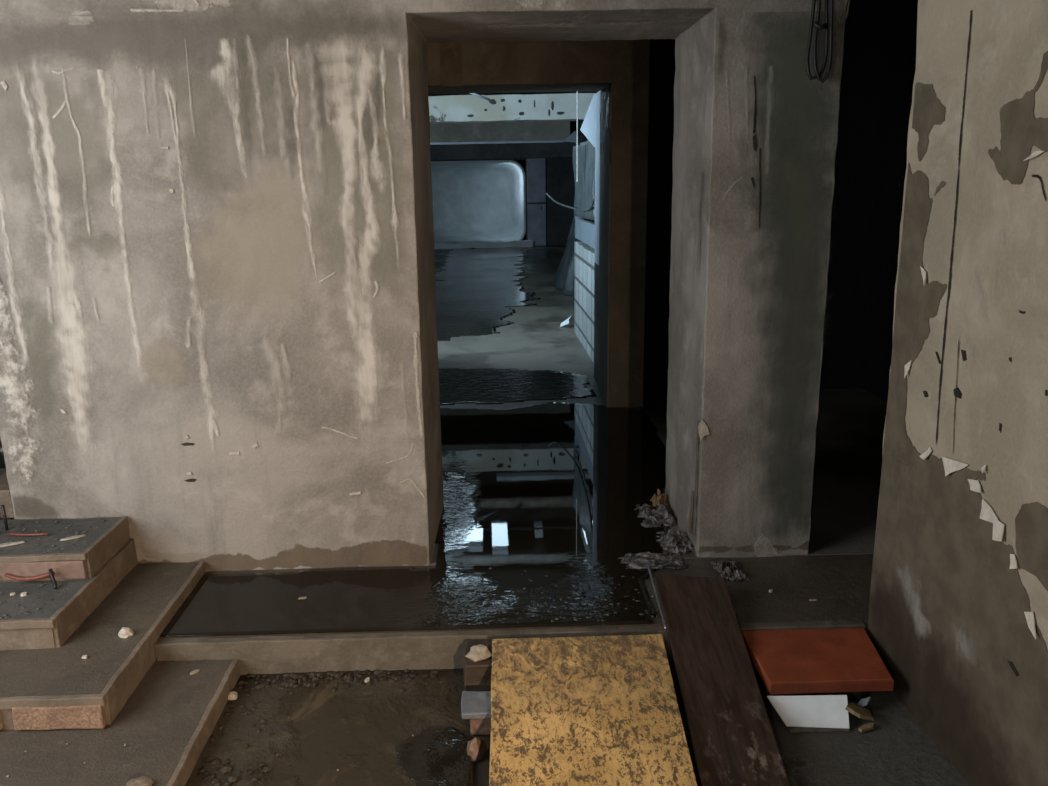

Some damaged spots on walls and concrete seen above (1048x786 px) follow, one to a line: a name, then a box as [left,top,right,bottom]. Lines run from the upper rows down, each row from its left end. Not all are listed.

leakage [0,12,398,484]
leakage [190,540,427,571]
peeling [867,82,1048,786]
peeling [988,51,1048,184]